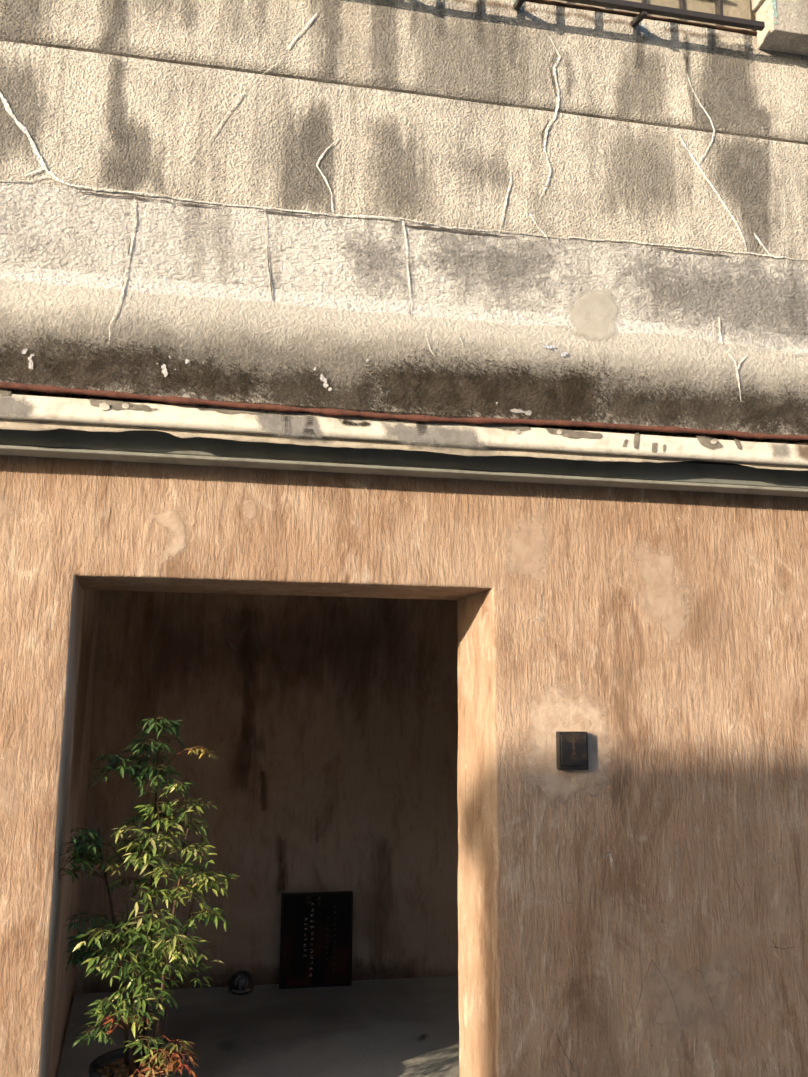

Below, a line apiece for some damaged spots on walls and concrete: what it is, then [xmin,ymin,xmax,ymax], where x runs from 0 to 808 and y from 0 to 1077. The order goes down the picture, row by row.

water stain [0,61,41,159]
water stain [0,0,44,42]
water stain [101,0,163,194]
crack [207,13,317,144]
water stain [282,104,333,217]
water stain [314,0,342,83]
water stain [371,0,397,87]
water stain [376,122,426,224]
crack [0,36,808,356]
water stain [684,37,778,250]
water stain [0,328,808,444]
crack [718,317,746,400]